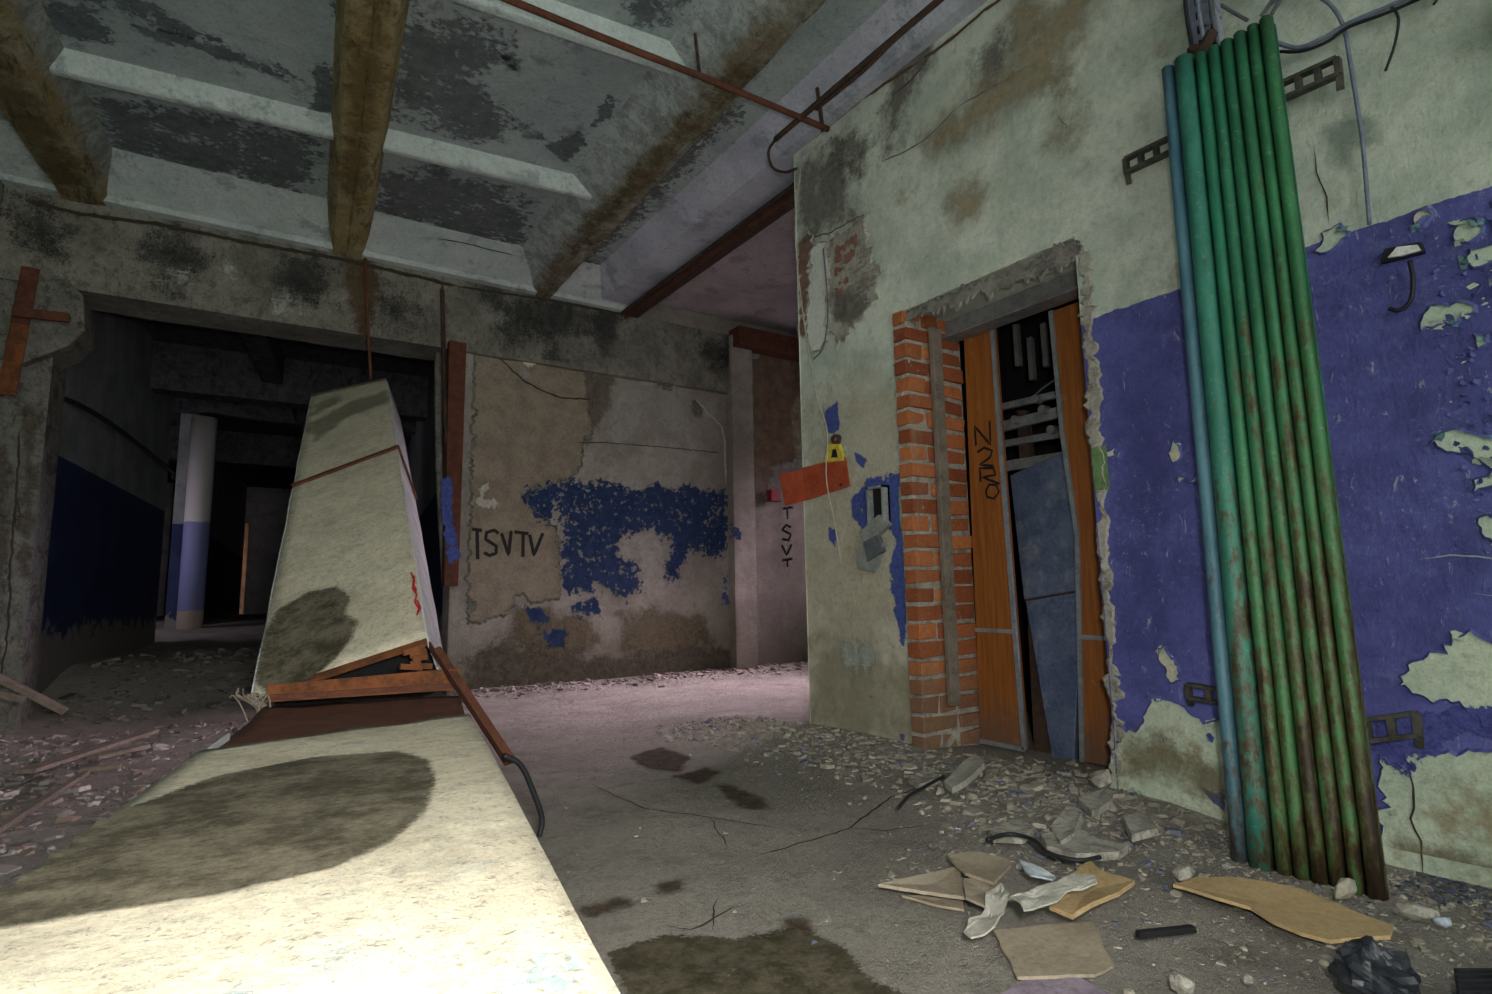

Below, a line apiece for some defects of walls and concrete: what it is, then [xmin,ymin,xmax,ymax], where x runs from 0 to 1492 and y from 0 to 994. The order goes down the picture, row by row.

damp [41,0,333,113]
damp [90,91,329,194]
damp [375,162,533,247]
damp [390,0,619,162]
damp [584,105,745,265]
damp [795,130,867,240]
damp [883,46,931,154]
peeling [1313,222,1352,256]
peeling [1410,200,1492,554]
peeling [463,354,604,651]
flaking render [753,213,1228,823]
peeling [1376,628,1492,888]